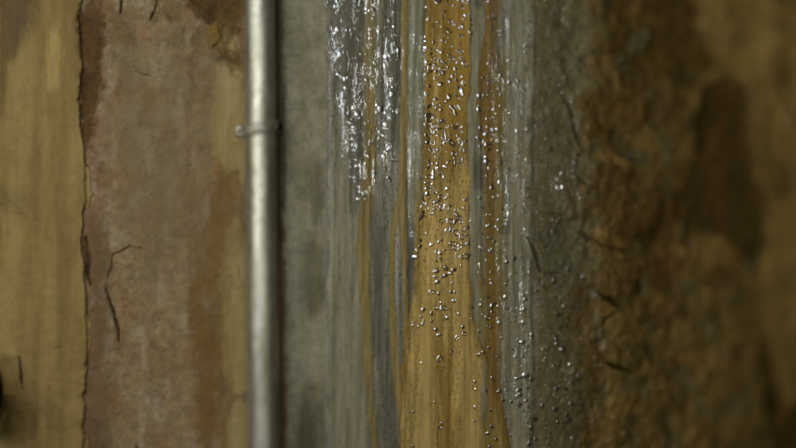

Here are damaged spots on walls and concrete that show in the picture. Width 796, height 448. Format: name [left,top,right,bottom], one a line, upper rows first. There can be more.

water stain [300,0,428,448]
rust [390,0,509,448]
water stain [466,0,598,448]
crack [531,243,564,275]
crack [566,105,579,156]
crack [595,294,636,374]